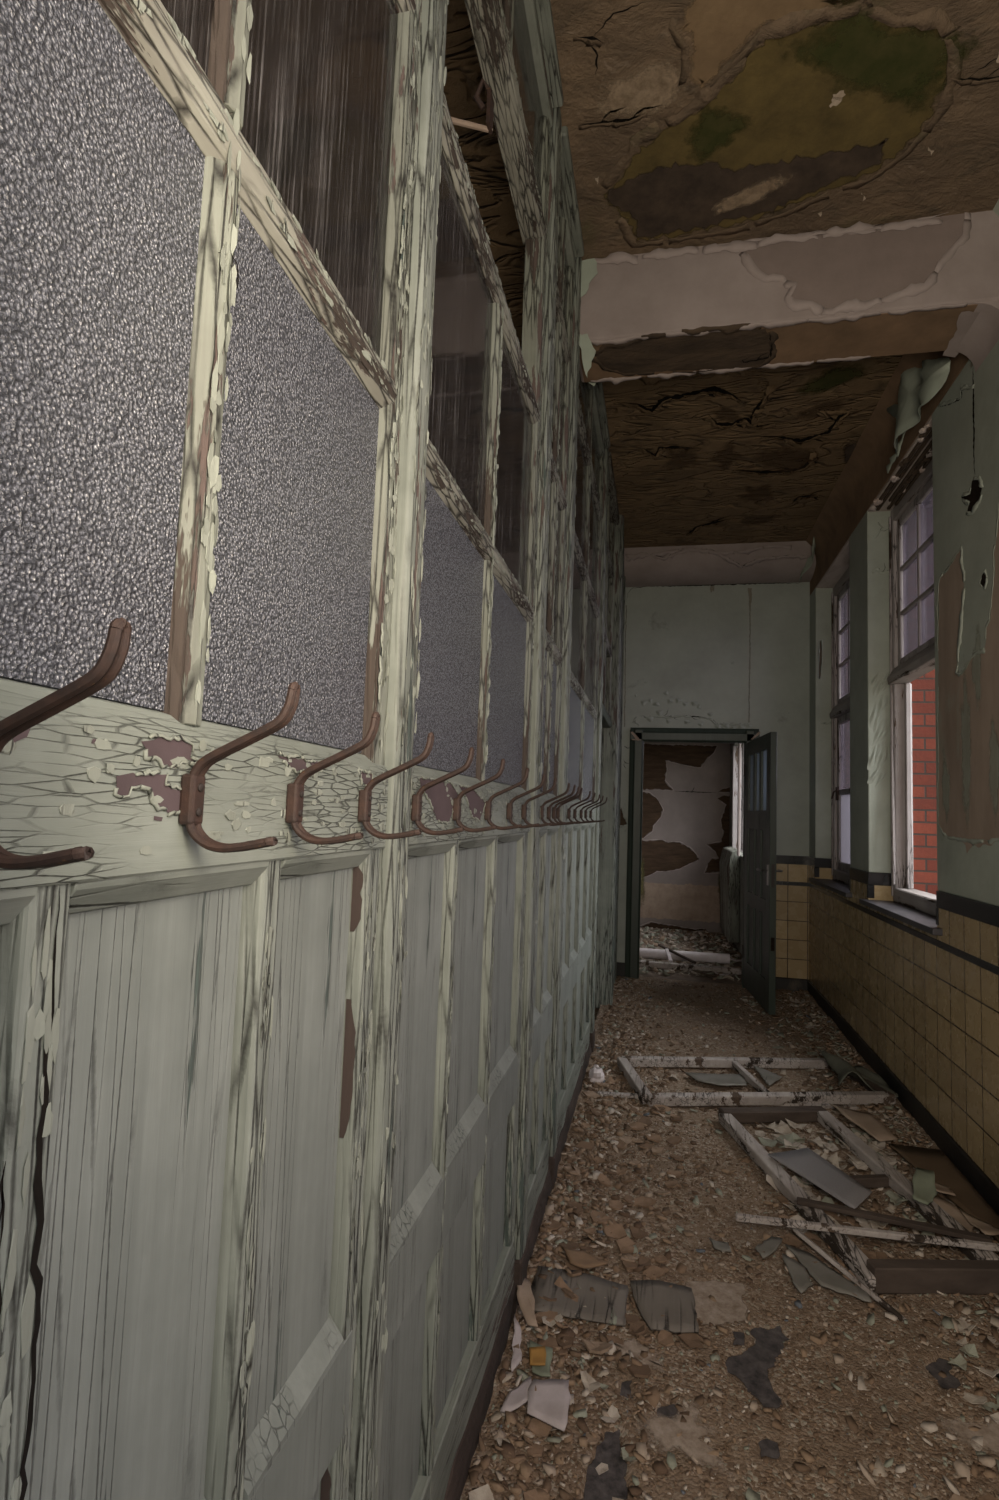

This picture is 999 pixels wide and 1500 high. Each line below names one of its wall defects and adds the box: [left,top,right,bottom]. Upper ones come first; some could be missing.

spalling [962,475,984,516]
peeling [1,729,30,755]
peeling [84,725,214,821]
peeling [937,507,999,853]
peeling [16,906,60,1207]
crack [0,888,60,1500]
peeling [348,1061,399,1318]
peeling [10,1476,22,1500]
peeling [0,1229,36,1463]
peeling [232,1204,255,1500]
peeling [320,1345,357,1500]
peeling [376,1282,388,1374]